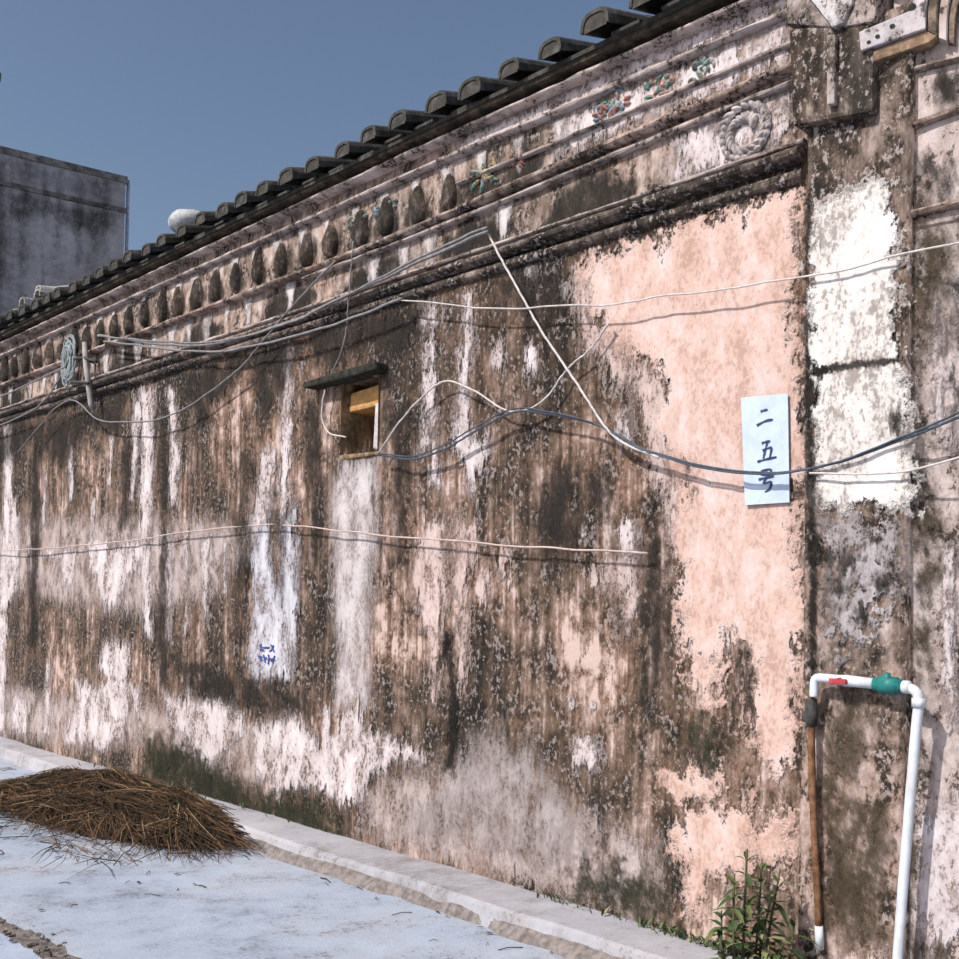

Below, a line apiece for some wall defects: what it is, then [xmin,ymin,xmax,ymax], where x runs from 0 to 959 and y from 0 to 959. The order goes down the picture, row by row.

leakage [0,227,329,408]
leakage [344,242,409,293]
leakage [337,149,495,250]
leakage [424,201,514,266]
leakage [506,116,566,183]
leakage [911,149,959,398]
leakage [0,289,493,835]
leakage [634,492,672,725]
leakage [910,441,950,687]
leakage [367,765,687,931]
leakage [810,664,896,946]
leakage [906,843,948,959]